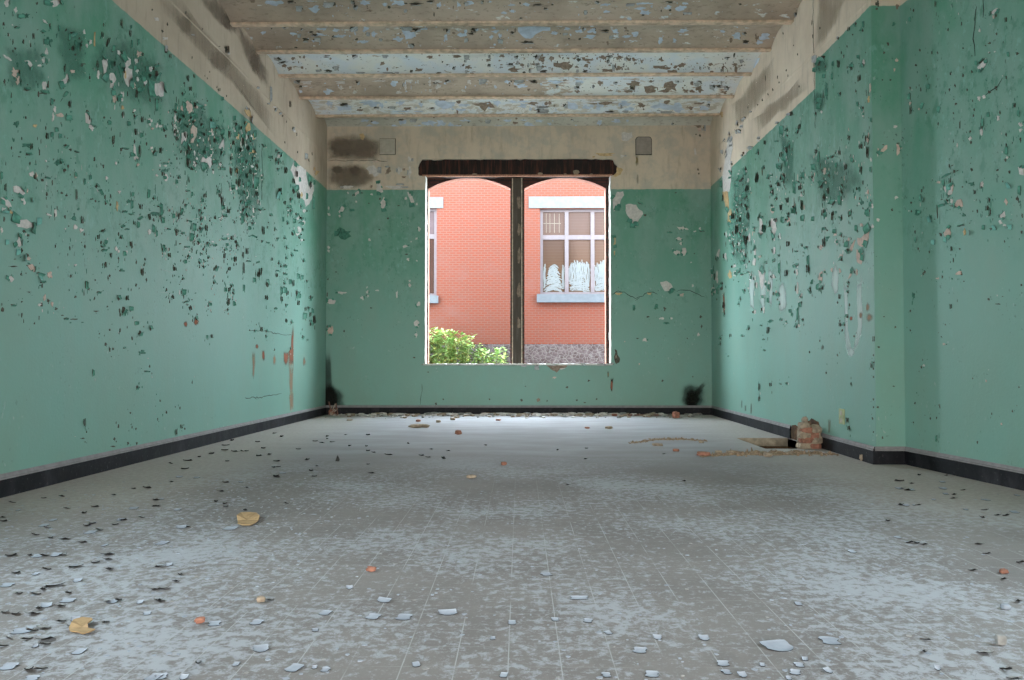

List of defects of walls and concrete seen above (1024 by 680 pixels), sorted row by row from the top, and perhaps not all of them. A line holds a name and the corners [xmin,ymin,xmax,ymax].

peeling [250,0,770,141]
peeling [0,0,345,390]
damp [333,140,373,184]
spalling [327,156,418,252]
peeling [610,191,646,228]
peeling [710,21,902,357]
peeling [891,8,1024,282]
peeling [660,281,694,296]
rust [253,332,305,409]
damp [325,362,341,405]
damp [685,386,703,405]